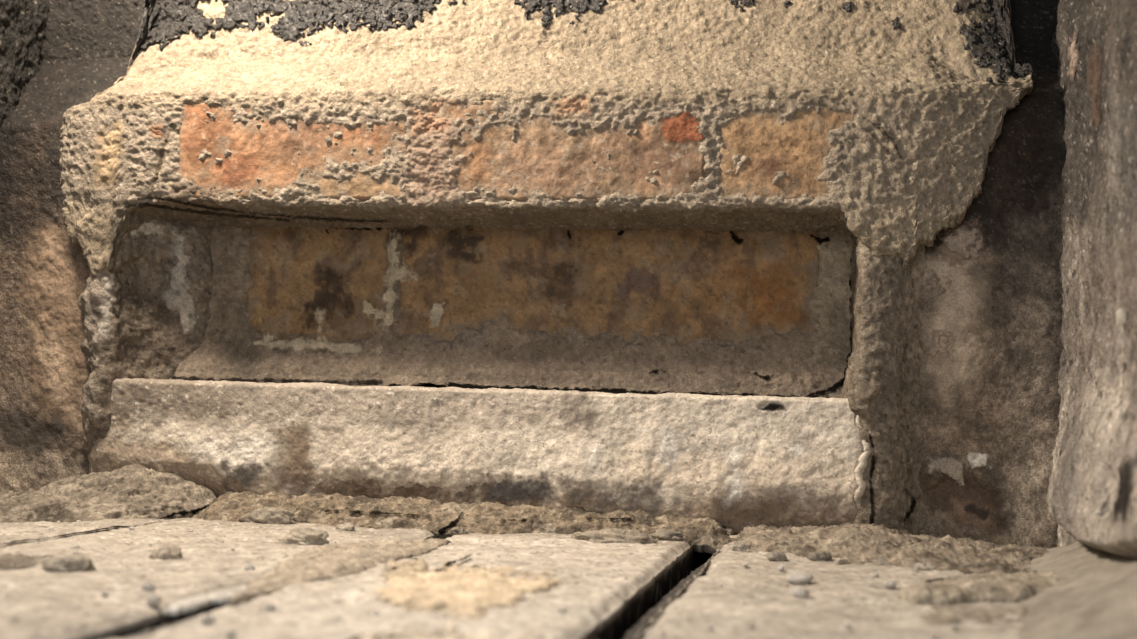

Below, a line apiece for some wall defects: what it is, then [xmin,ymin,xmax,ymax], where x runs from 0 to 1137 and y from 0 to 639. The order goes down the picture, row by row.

damp [363,234,417,326]
damp [430,303,444,327]
crack [868,434,876,524]
crack [161,500,215,519]
crack [904,492,917,522]
crack [2,525,130,544]